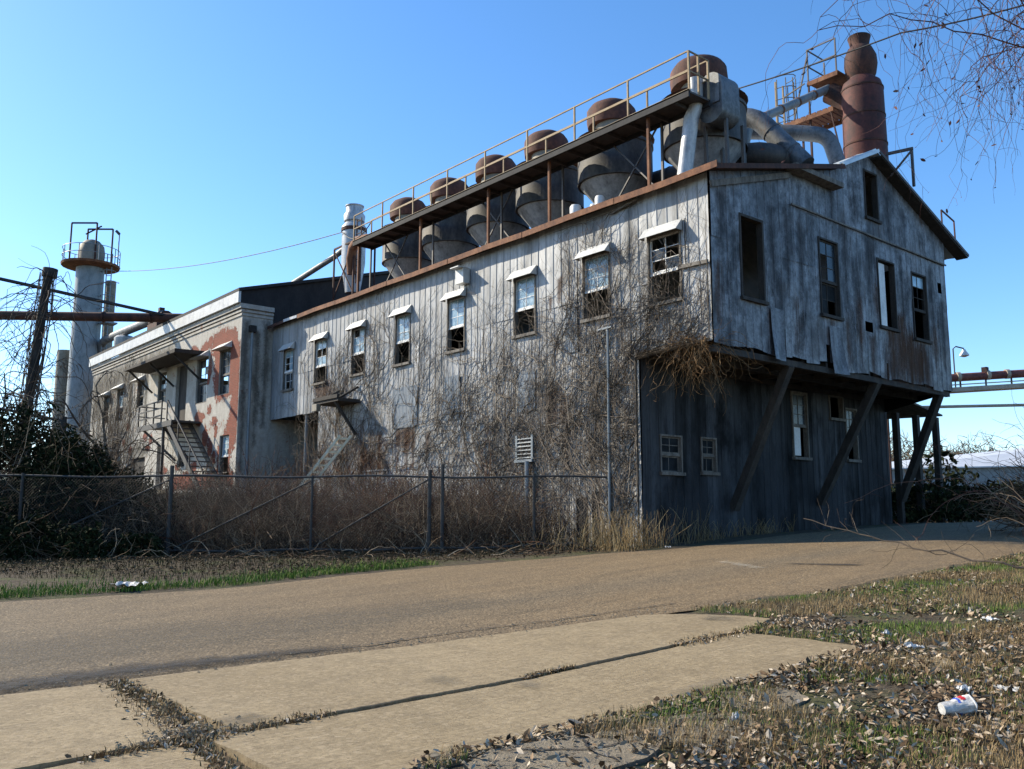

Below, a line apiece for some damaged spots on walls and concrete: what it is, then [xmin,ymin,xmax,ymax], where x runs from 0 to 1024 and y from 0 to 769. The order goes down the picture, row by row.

peeling [163,325,241,491]